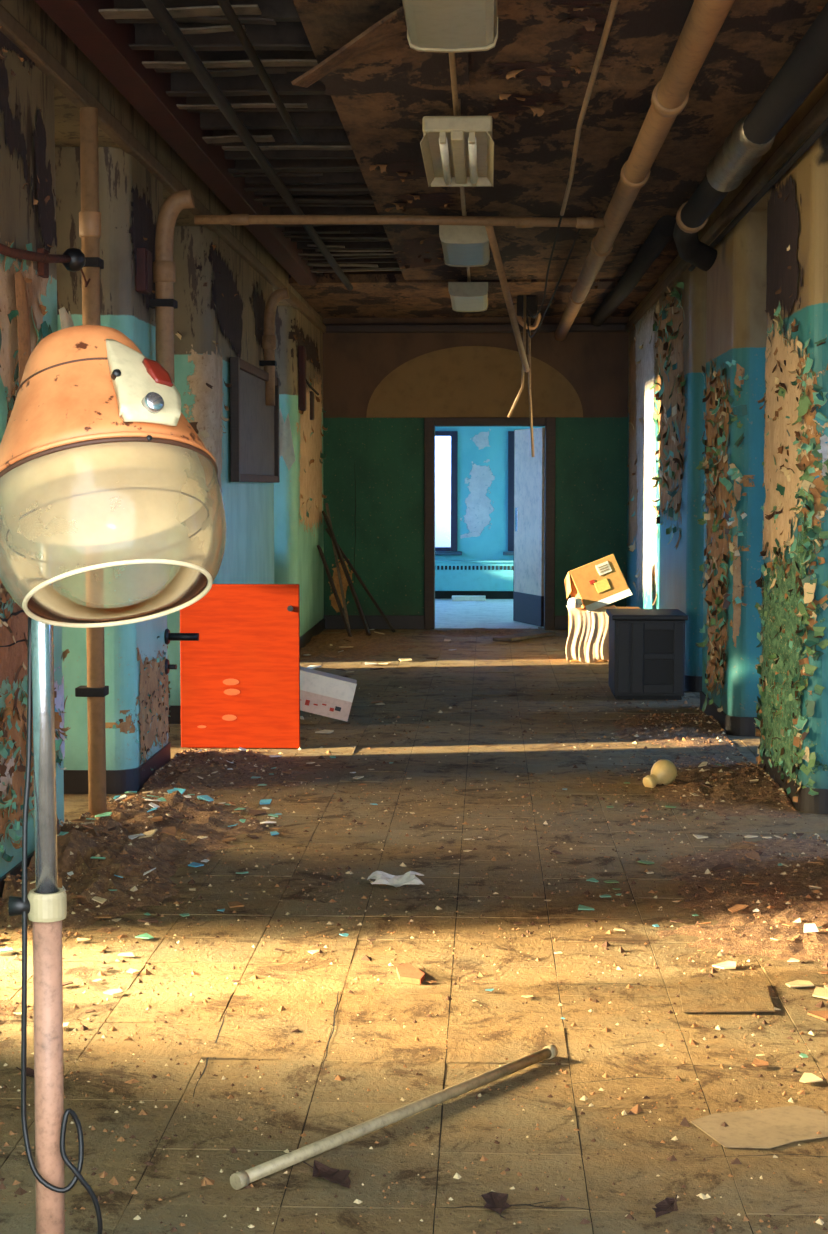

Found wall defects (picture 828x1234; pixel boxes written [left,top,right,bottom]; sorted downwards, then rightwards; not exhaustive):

water stain [817,129,828,165]
peeling [0,26,74,443]
peeling [460,429,495,539]
peeling [627,174,828,803]
spalling [0,579,34,862]
peeling [54,645,71,770]
peeling [105,636,172,771]